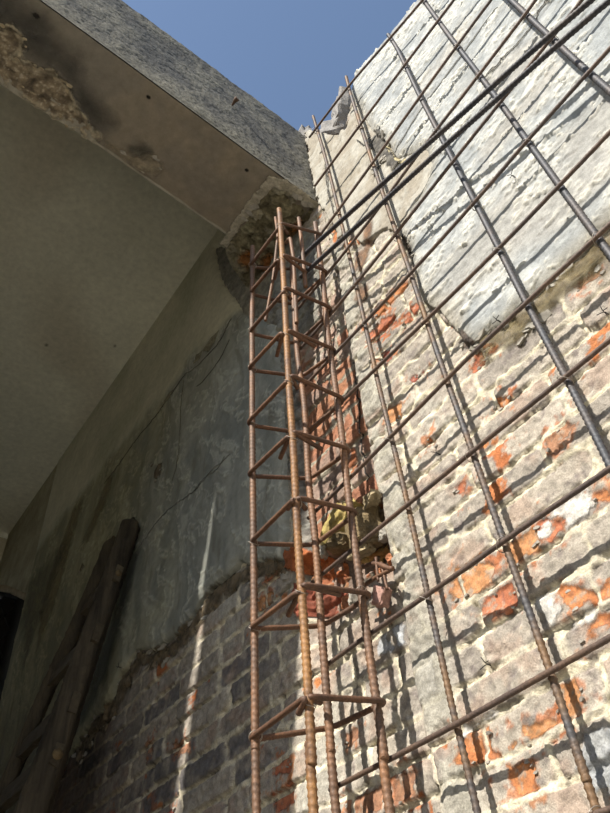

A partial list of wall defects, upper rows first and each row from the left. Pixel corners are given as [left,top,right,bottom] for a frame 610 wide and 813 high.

damp [0,0,110,124]
spalling [0,23,162,176]
crack [485,0,548,77]
spalling [219,175,319,288]
crack [104,319,231,484]
crack [353,362,370,481]
spalling [298,0,610,813]
flaking render [71,482,358,767]
spalling [272,758,295,813]